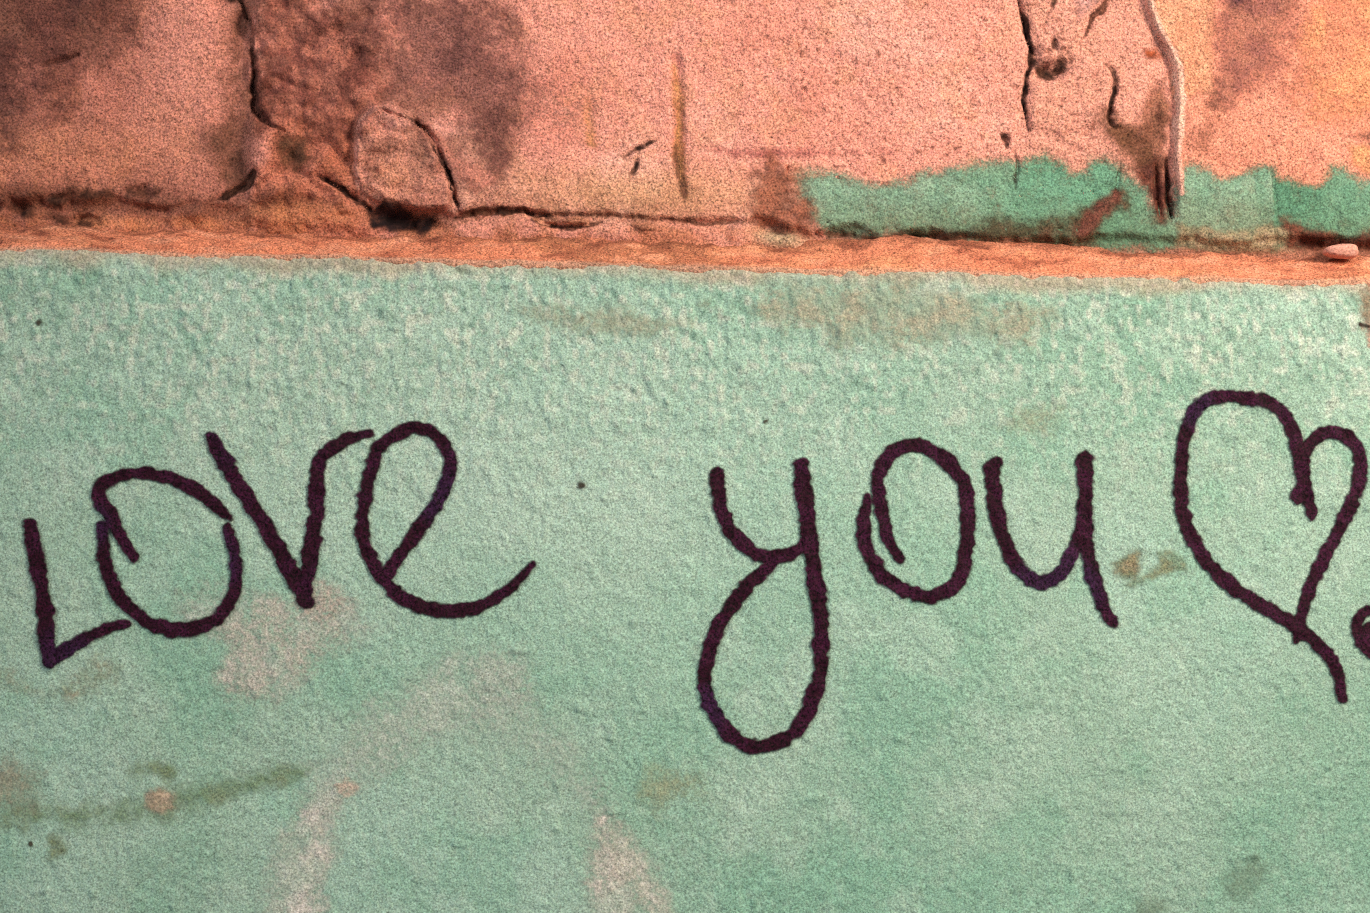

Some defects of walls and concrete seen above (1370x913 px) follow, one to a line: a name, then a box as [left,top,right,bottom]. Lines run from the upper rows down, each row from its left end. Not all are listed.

crack [1086,0,1108,35]
crack [238,0,279,128]
crack [1001,0,1056,183]
crack [1106,70,1118,127]
crack [220,169,256,200]
water stain [277,135,309,172]
crack [321,177,372,212]
water stain [368,102,515,185]
crack [381,107,717,230]
crack [1165,168,1173,219]
peeling [1177,224,1288,252]